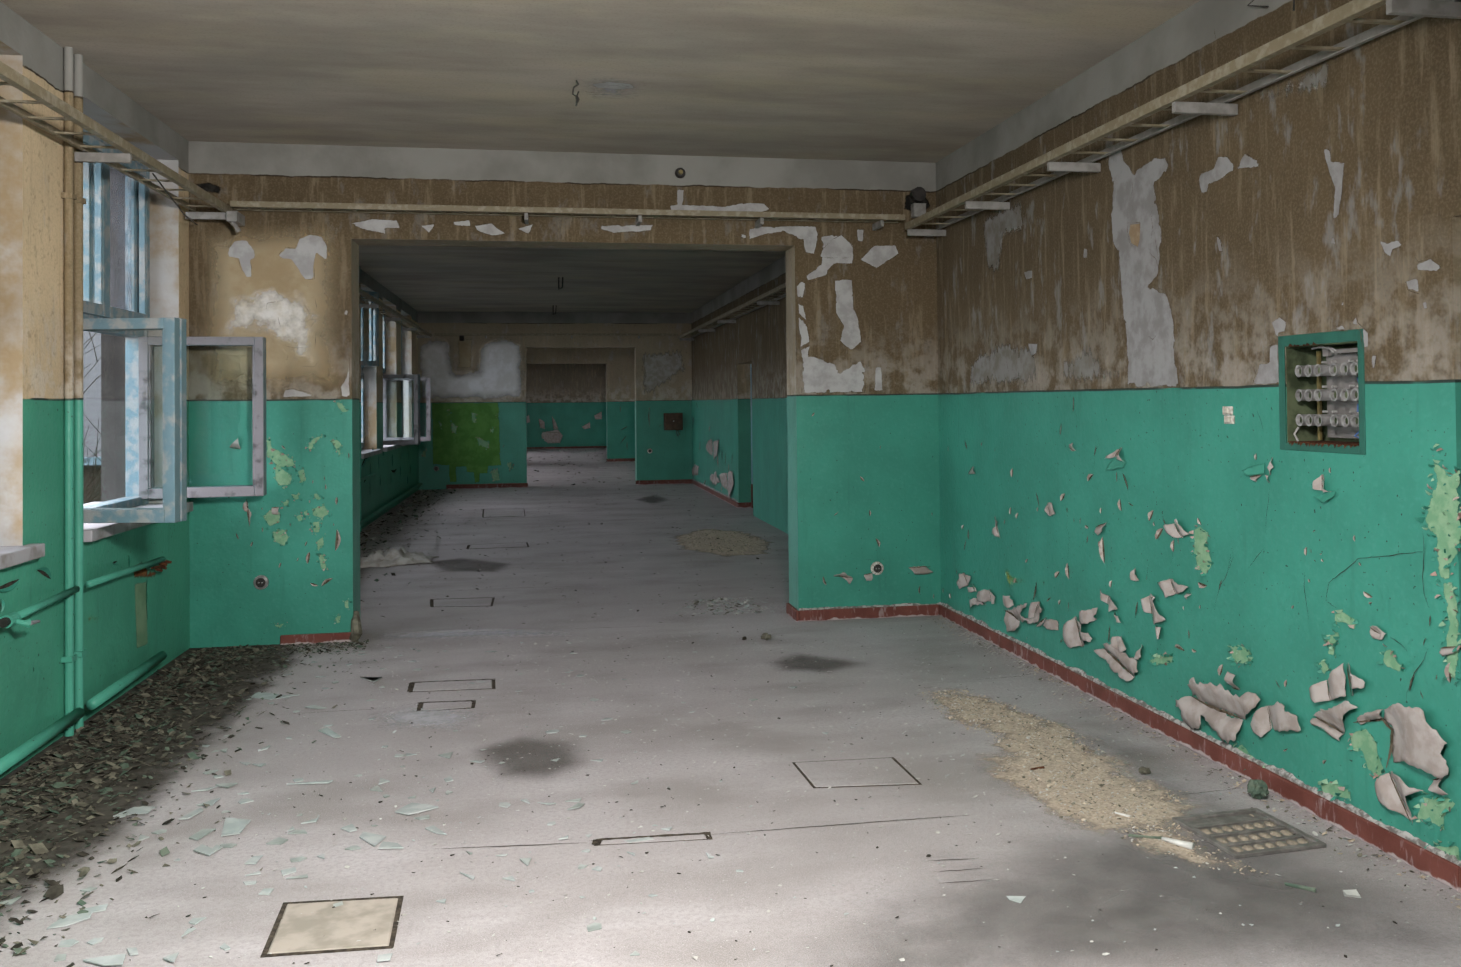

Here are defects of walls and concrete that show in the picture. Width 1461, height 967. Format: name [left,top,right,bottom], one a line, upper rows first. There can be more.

flaking render [208,233,350,415]
flaking render [352,218,399,234]
flaking render [421,341,520,450]
flaking render [454,219,533,236]
flaking render [596,224,652,233]
flaking render [670,189,898,393]
flaking render [1064,150,1178,410]
flaking render [1198,153,1258,194]
flaking render [1253,317,1286,385]
flaking render [1324,149,1344,244]
peeling [236,434,397,587]
flaking render [799,444,1461,867]